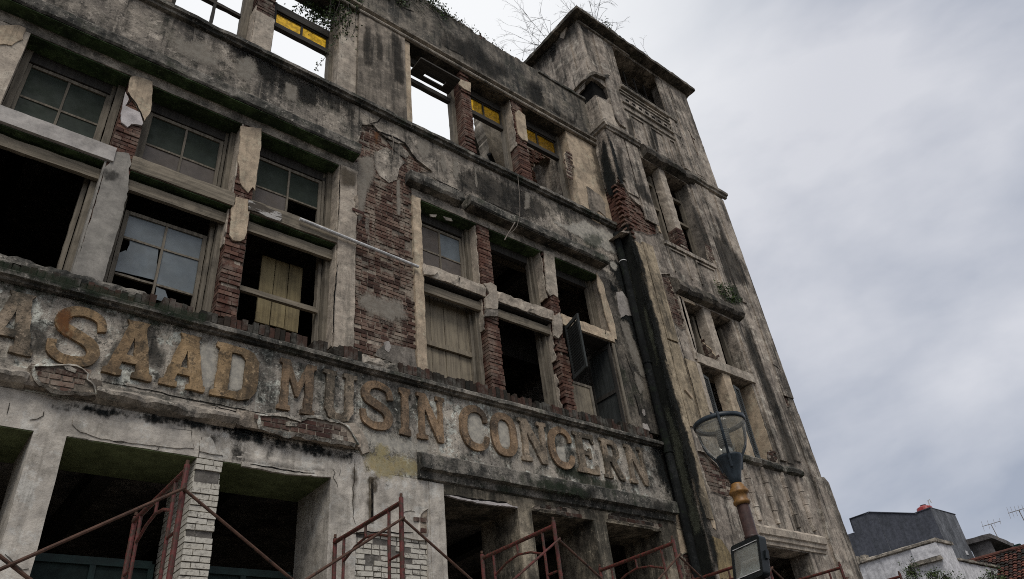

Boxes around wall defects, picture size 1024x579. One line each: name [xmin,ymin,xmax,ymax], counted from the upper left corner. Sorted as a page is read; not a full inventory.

leakage [364,26,403,84]
flaking render [120,76,153,128]
flaking render [459,80,471,93]
flaking render [515,110,528,142]
spalling [354,124,432,189]
flaking render [229,126,282,242]
spalling [586,180,689,251]
spalling [29,362,97,396]
leakage [66,404,126,418]
leakage [140,412,377,510]
spalling [254,412,370,455]
leakage [363,429,431,459]